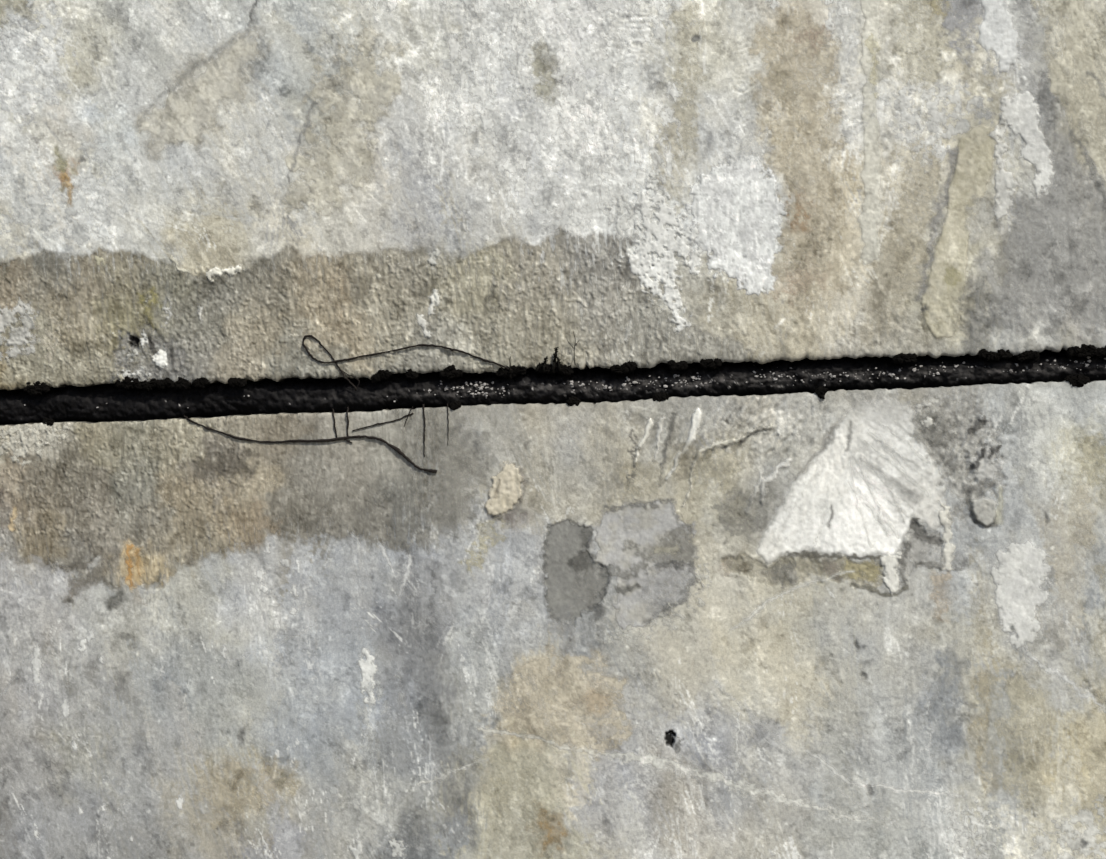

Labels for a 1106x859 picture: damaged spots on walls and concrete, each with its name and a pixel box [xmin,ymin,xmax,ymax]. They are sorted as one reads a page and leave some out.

damp [0,0,747,390]
rust [122,544,145,589]
damp [0,408,481,732]
flaking render [543,500,699,630]
spalling [722,389,1004,621]